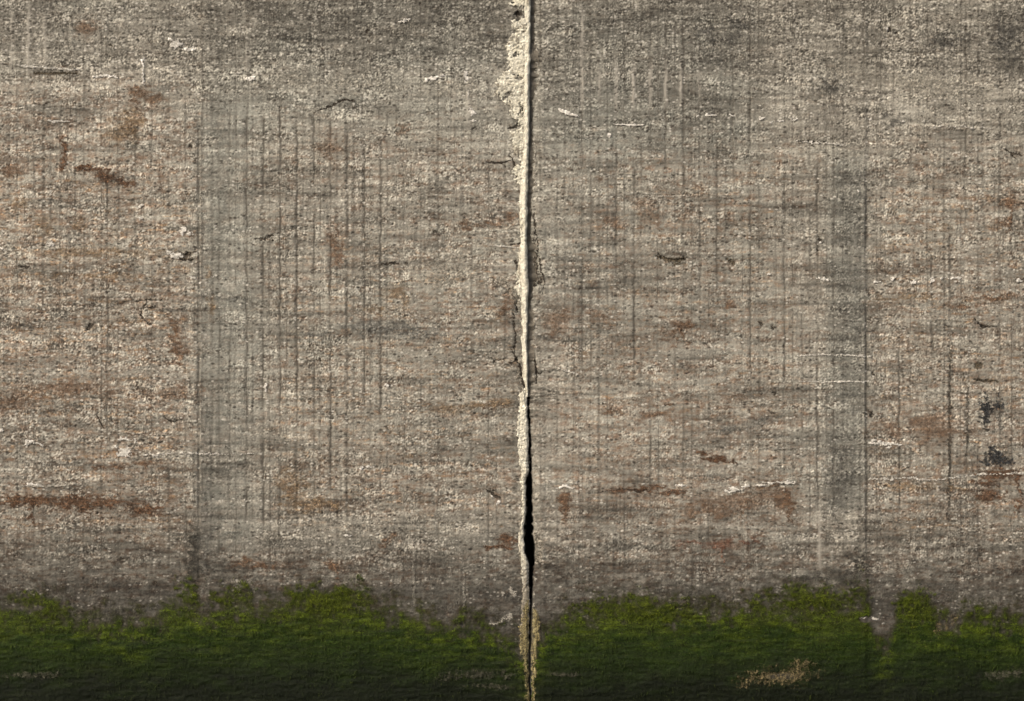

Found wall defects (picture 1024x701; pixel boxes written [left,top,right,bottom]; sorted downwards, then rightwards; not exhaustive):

corrosion [59,135,136,187]
crack [488,157,517,183]
crack [514,206,545,294]
crack [493,301,544,388]
water stain [868,350,1024,506]
corrosion [0,492,164,527]
water stain [490,586,541,701]